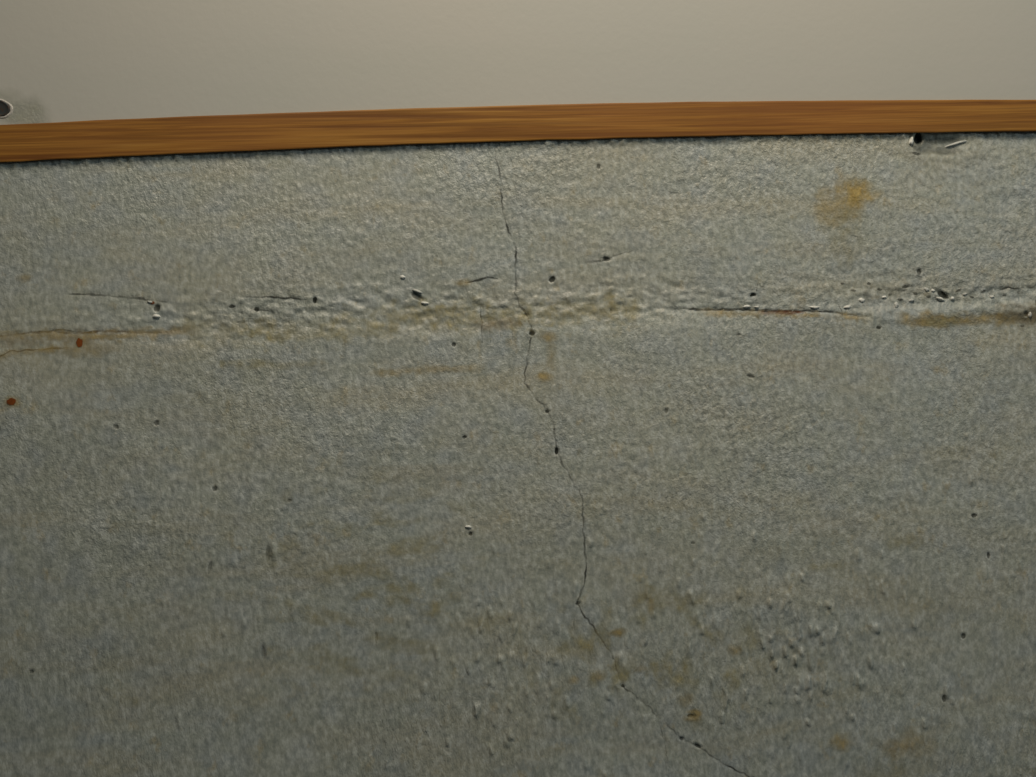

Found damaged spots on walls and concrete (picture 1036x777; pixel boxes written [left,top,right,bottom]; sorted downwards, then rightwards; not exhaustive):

crack [689,290,865,319]